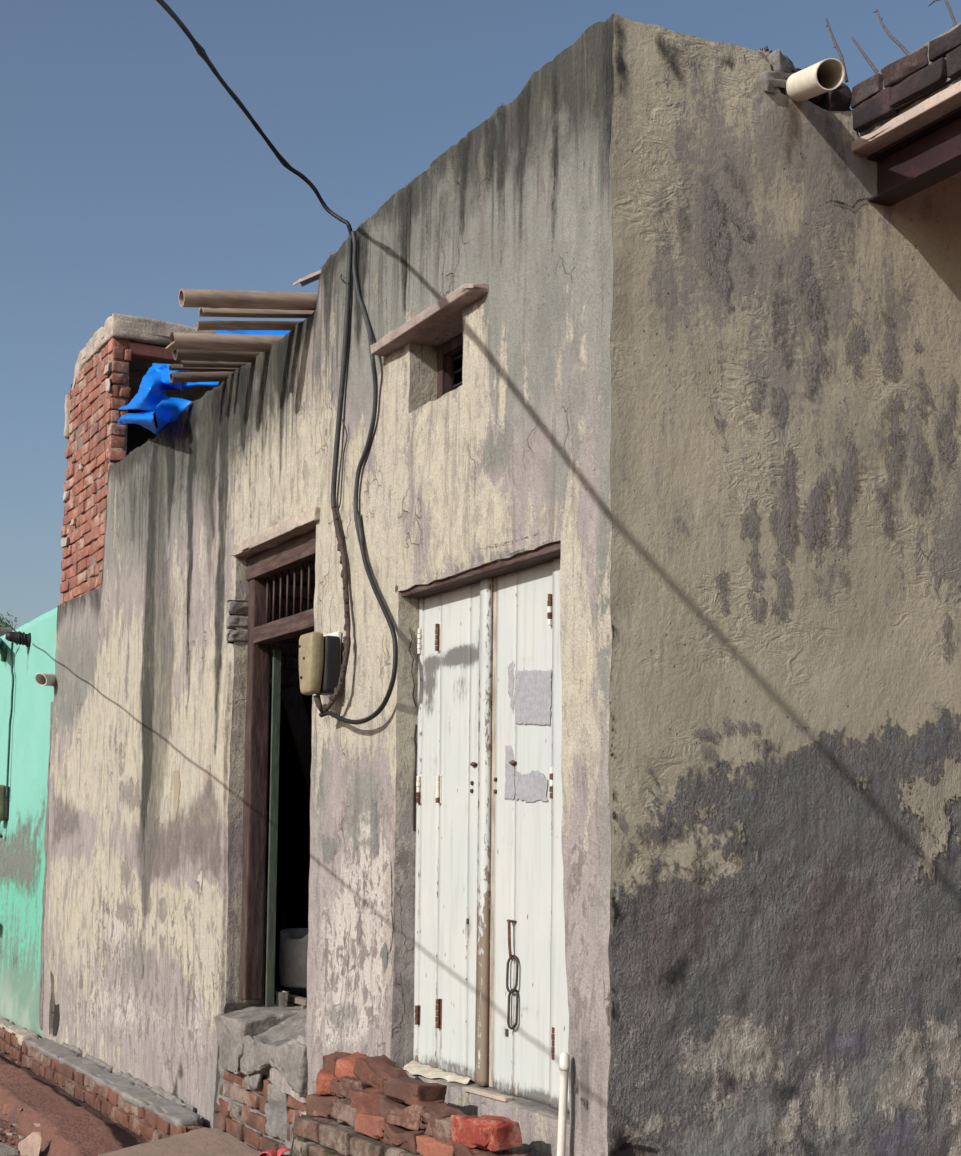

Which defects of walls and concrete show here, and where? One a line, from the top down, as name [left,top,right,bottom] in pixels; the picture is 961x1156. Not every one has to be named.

water stain [589,23,626,150]
water stain [485,89,539,203]
water stain [354,228,368,337]
water stain [398,186,410,301]
peeling [770,287,832,399]
water stain [264,336,290,467]
peeling [740,307,961,624]
water stain [140,366,250,899]
peeling [714,569,730,614]
peeling [691,714,774,772]
peeling [618,808,684,885]
spalling [609,1123,667,1156]